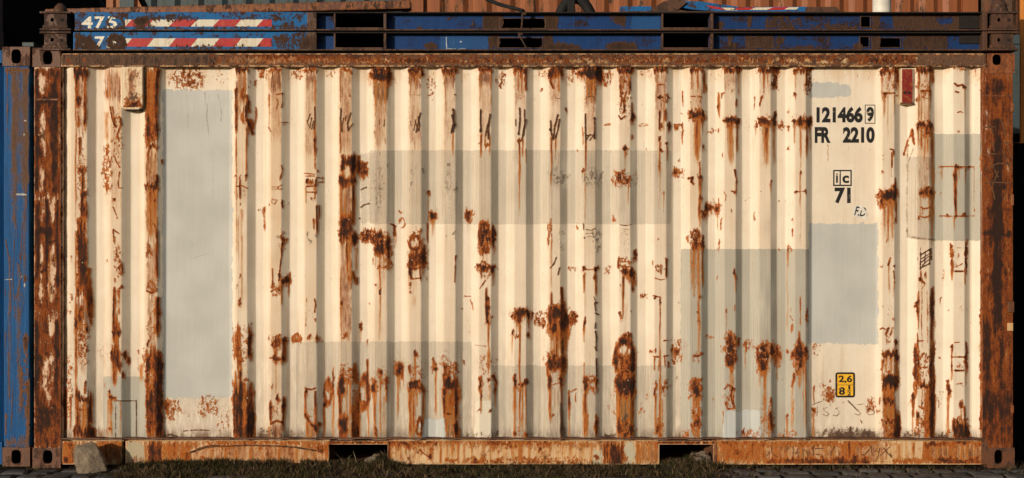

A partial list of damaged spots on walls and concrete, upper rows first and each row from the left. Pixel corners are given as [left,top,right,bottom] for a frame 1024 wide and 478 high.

rust [5,13,225,464]
rust [99,54,1012,464]